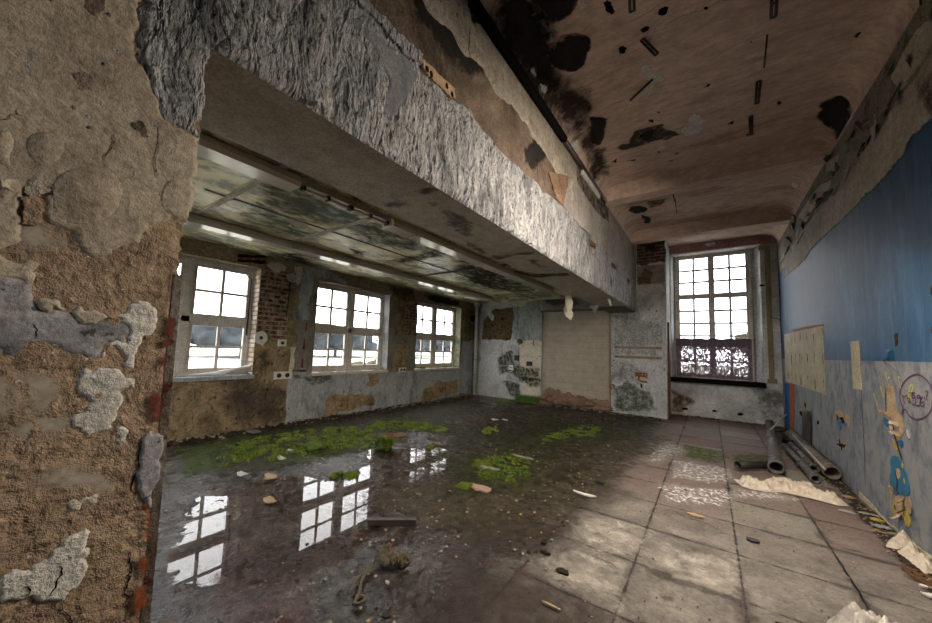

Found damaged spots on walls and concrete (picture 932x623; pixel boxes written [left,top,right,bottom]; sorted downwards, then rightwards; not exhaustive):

water stain [488,0,608,180]
water stain [817,95,851,141]
peeling [780,54,932,278]
water stain [242,182,417,249]
peeling [0,0,666,445]
water stain [454,252,568,292]
water stain [498,350,541,397]
water stain [614,316,661,412]
peeling [136,431,164,508]
flaking render [859,491,900,533]
peeling [0,528,90,604]